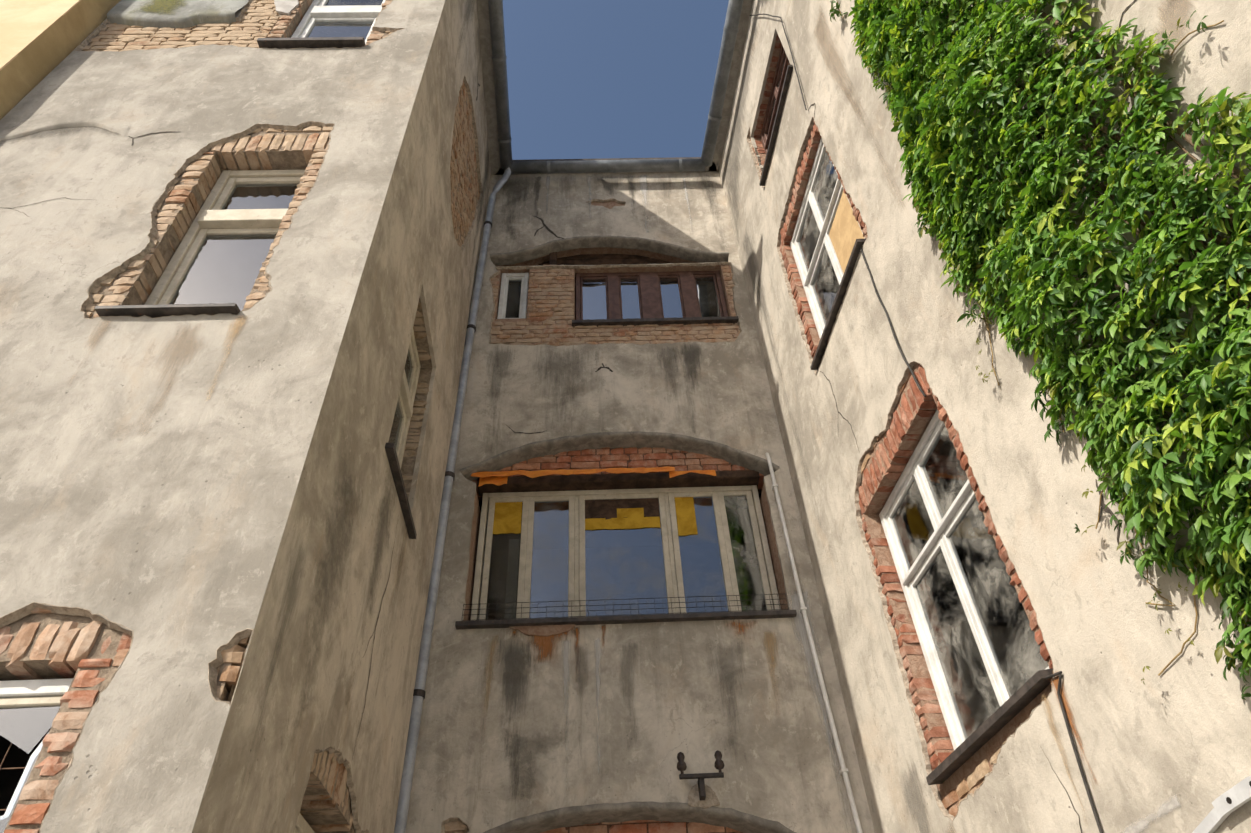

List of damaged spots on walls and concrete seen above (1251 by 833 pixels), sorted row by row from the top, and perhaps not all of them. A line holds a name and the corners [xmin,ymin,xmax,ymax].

damp [140,0,186,15]
flaking render [74,0,404,52]
flaking render [450,76,483,252]
flaking render [80,121,335,319]
flaking render [854,360,1054,822]
flaking render [208,628,254,706]
damp [487,646,529,707]
corrosion [513,628,579,662]
flaking render [0,601,134,833]
flaking render [441,817,470,833]